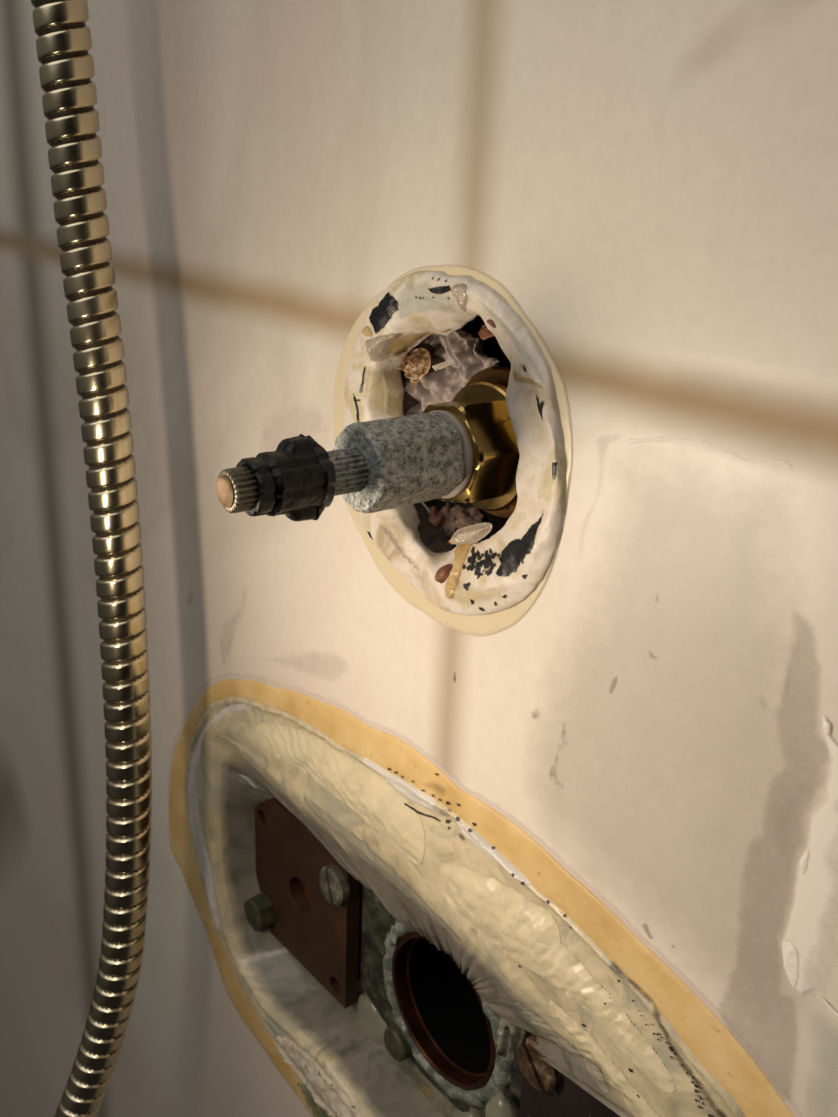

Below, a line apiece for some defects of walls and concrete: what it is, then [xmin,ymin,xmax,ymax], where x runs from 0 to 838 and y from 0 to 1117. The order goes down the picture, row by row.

leakage [462,512,543,611]